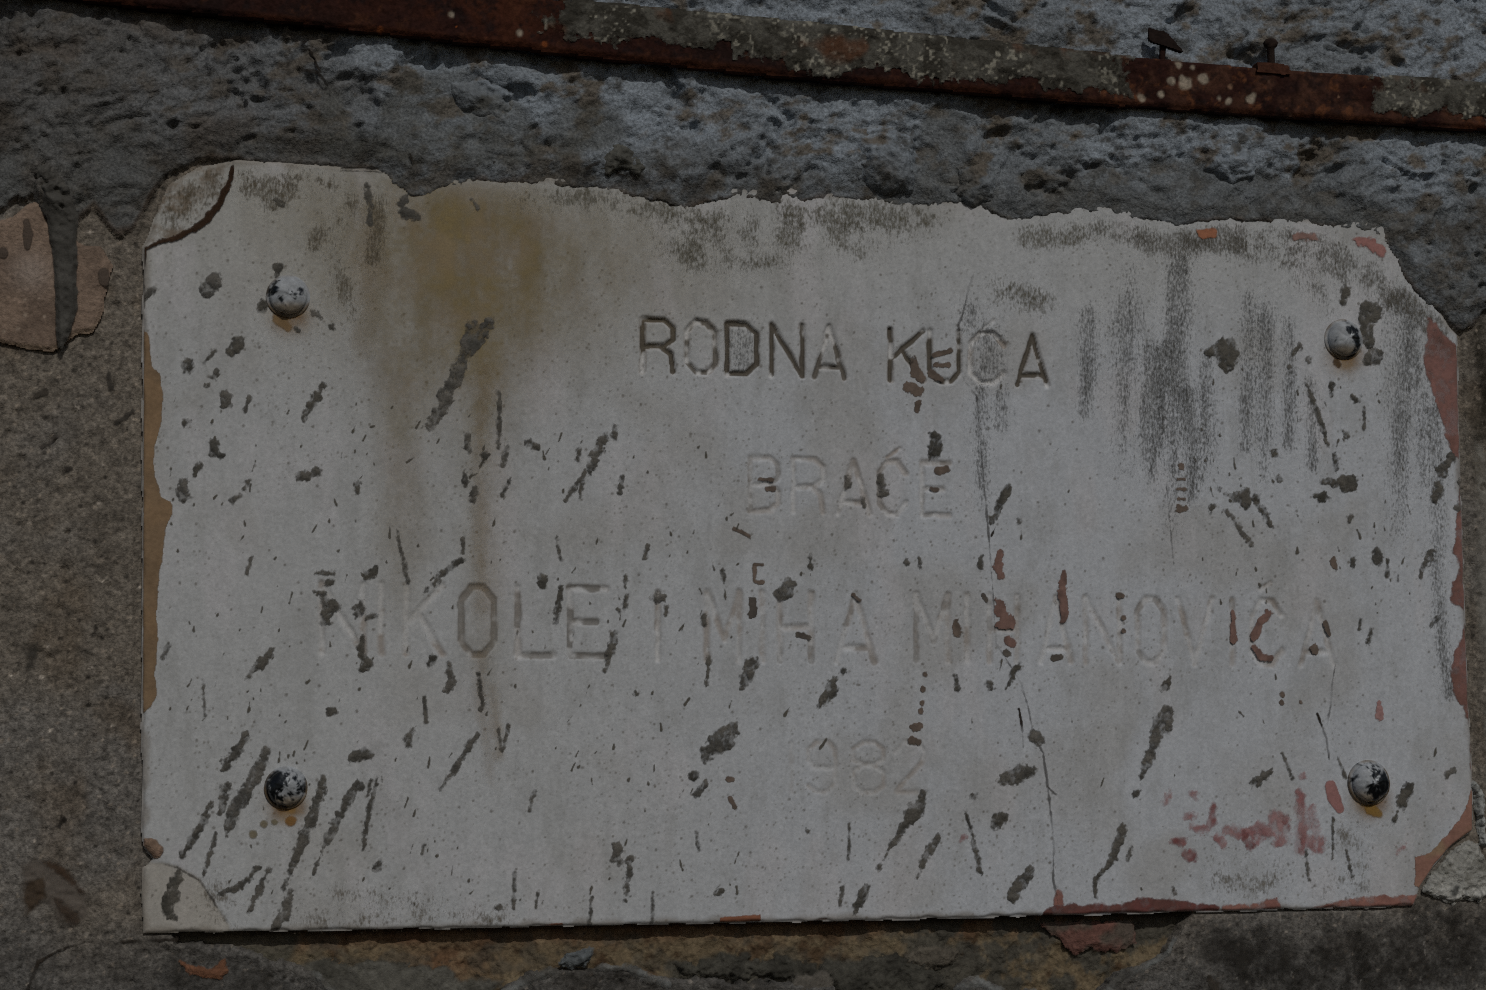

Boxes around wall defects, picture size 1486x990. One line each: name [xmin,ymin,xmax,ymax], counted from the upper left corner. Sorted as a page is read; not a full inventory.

flaking render [0,202,113,353]
flaking render [173,890,1281,990]